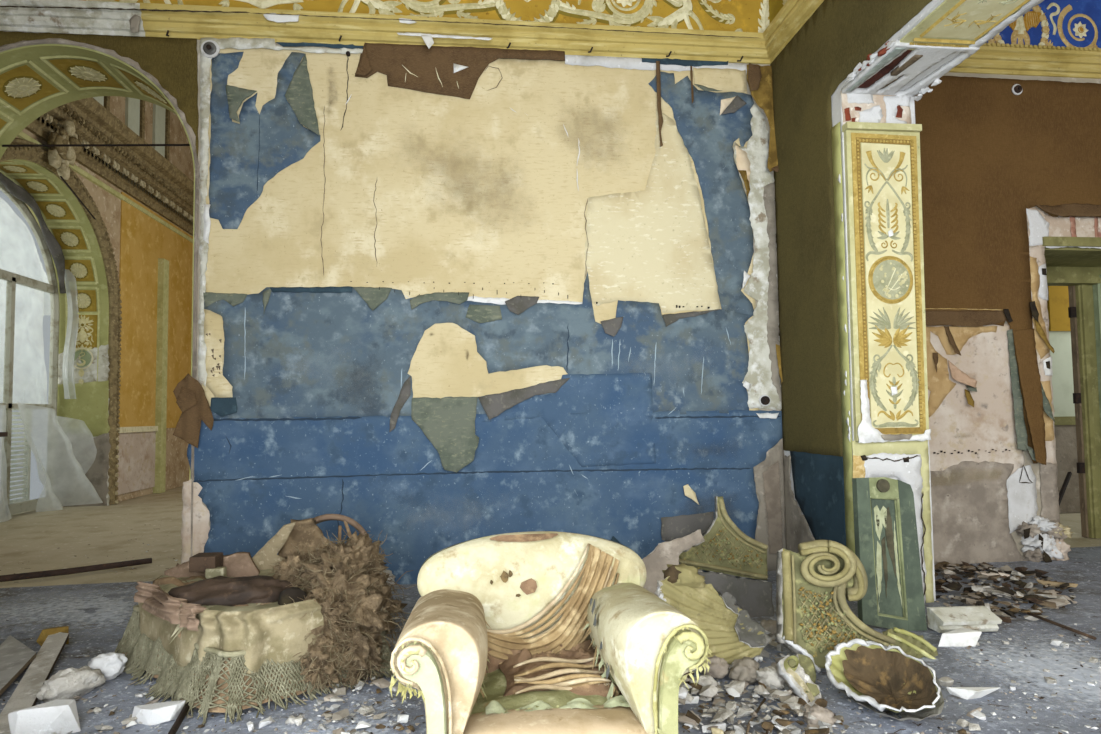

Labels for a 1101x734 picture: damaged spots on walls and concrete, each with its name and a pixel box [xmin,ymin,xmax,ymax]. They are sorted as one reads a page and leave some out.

flaking render [565,55,748,75]
flaking render [840,0,1044,125]
peeling [733,103,783,419]
flaking render [1026,207,1101,523]
flaking render [181,445,210,564]
flaking render [753,438,815,571]
flaking render [846,324,1025,609]